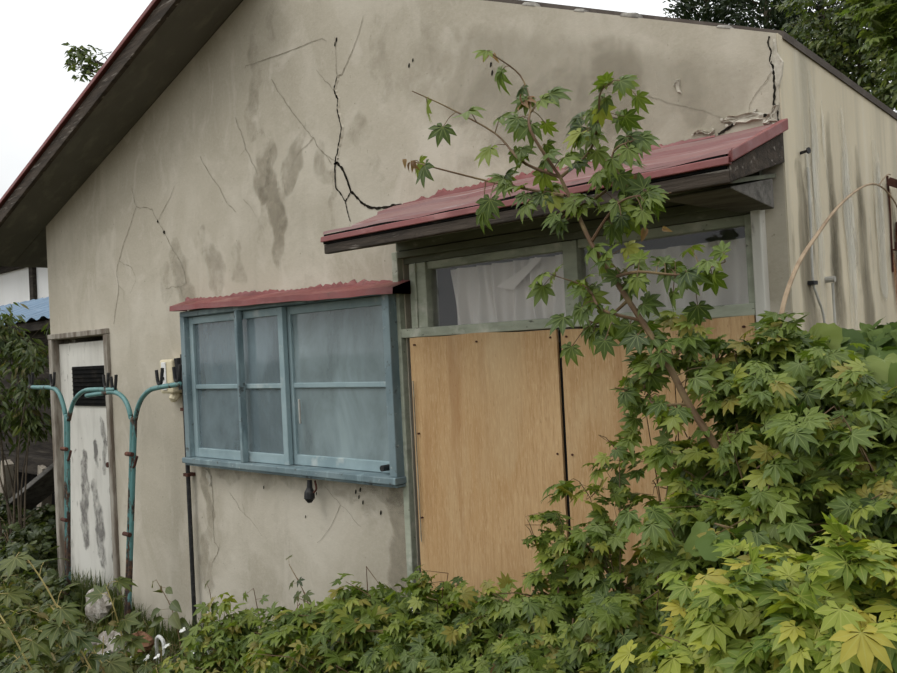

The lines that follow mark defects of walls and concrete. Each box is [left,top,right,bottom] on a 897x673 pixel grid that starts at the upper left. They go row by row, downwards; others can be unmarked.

crack [246,18,402,221]
crack [593,36,779,135]
flaking render [691,104,779,136]
crack [114,188,186,318]
leakage [80,440,113,566]